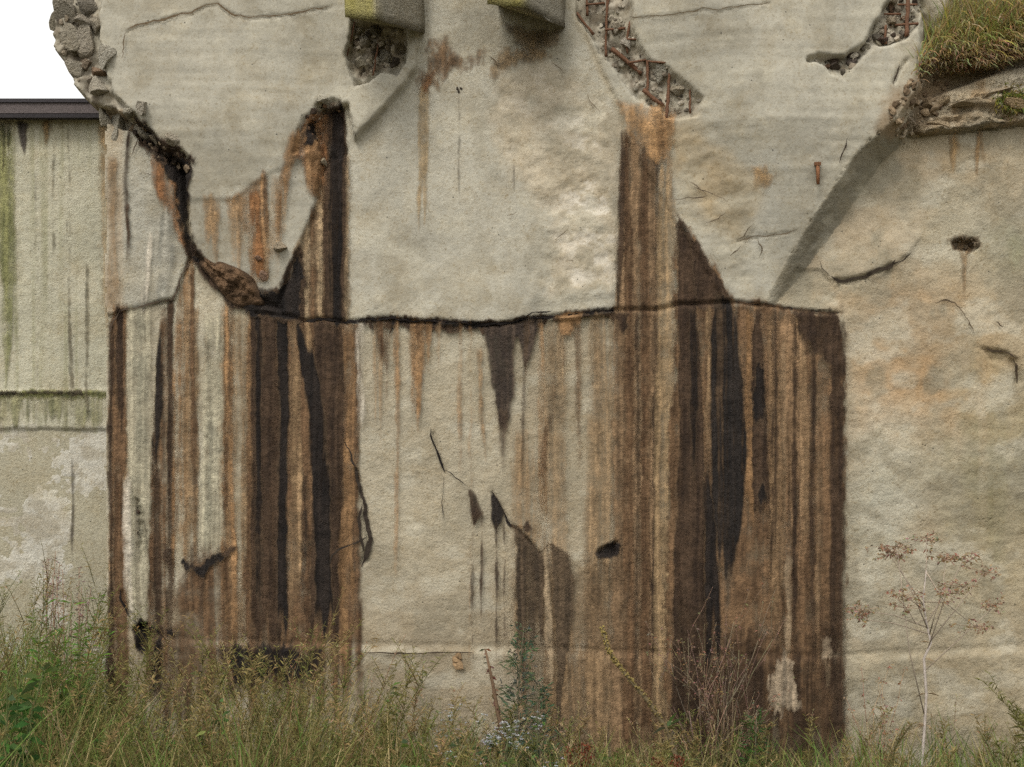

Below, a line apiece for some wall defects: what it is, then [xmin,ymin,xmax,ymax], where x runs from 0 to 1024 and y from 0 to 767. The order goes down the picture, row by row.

spalling [49,0,190,174]
crack [122,3,329,56]
spalling [353,25,404,77]
spalling [578,0,701,114]
spalling [815,0,921,76]
water stain [0,121,28,363]
crack [109,259,190,333]
crack [820,253,911,283]
crack [937,299,1018,382]
water stain [108,117,615,737]
crack [430,428,464,520]
water stain [663,217,849,767]